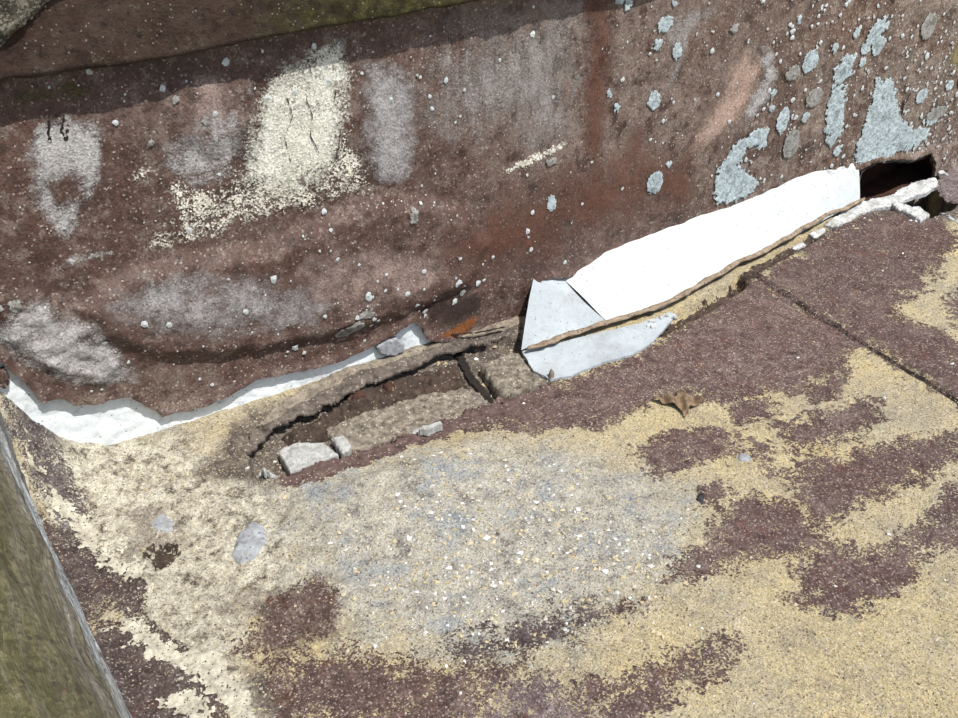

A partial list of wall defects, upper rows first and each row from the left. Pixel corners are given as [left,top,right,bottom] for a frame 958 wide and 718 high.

damp [25,116,101,236]
damp [150,42,414,247]
spalling [281,363,468,446]
peeling [428,155,958,624]
peeling [0,322,429,718]
peeling [230,572,749,718]